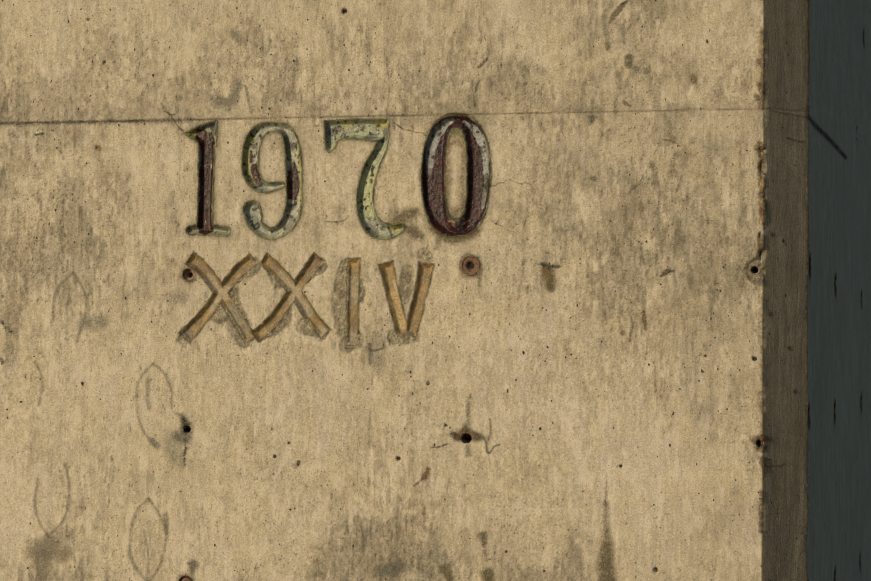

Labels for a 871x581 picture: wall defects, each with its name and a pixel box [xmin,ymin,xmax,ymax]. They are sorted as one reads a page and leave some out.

leakage [598,502,614,581]